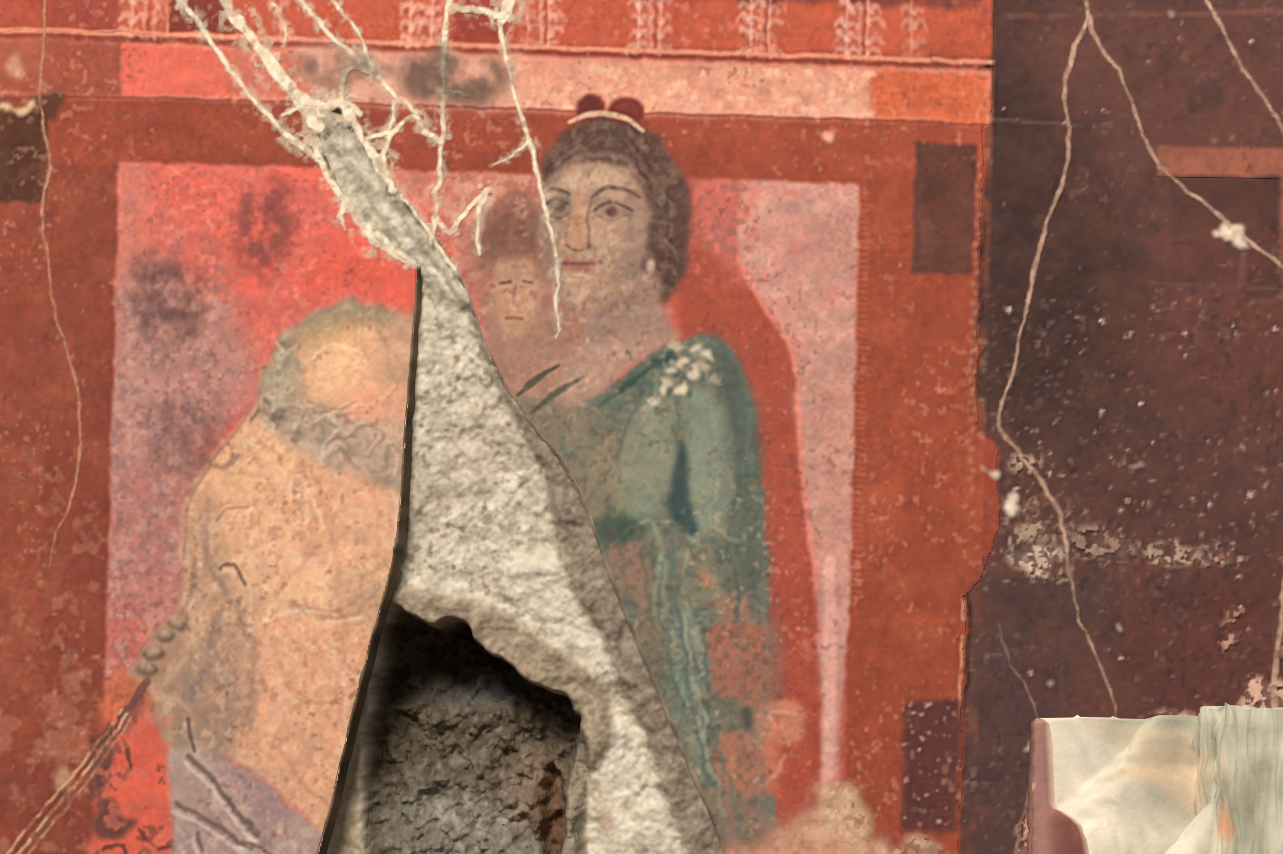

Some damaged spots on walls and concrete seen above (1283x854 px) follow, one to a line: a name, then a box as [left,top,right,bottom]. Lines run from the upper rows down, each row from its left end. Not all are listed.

crack [16,0,81,509]
crack [176,0,560,333]
spalling [313,107,940,854]
crack [998,0,1281,708]
crack [1270,581,1283,708]